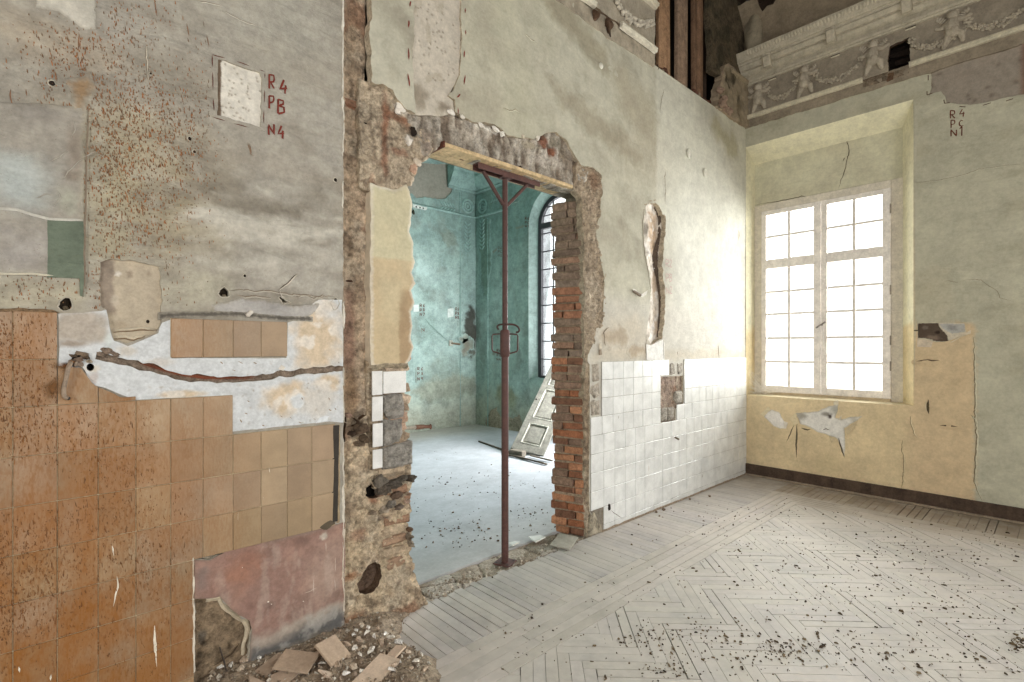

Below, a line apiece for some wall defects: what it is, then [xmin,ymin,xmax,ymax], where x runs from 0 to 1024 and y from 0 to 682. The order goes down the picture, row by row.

flaking render [56,0,466,682]
spalling [660,363,683,422]
peeling [761,400,862,457]
peeling [914,322,983,501]